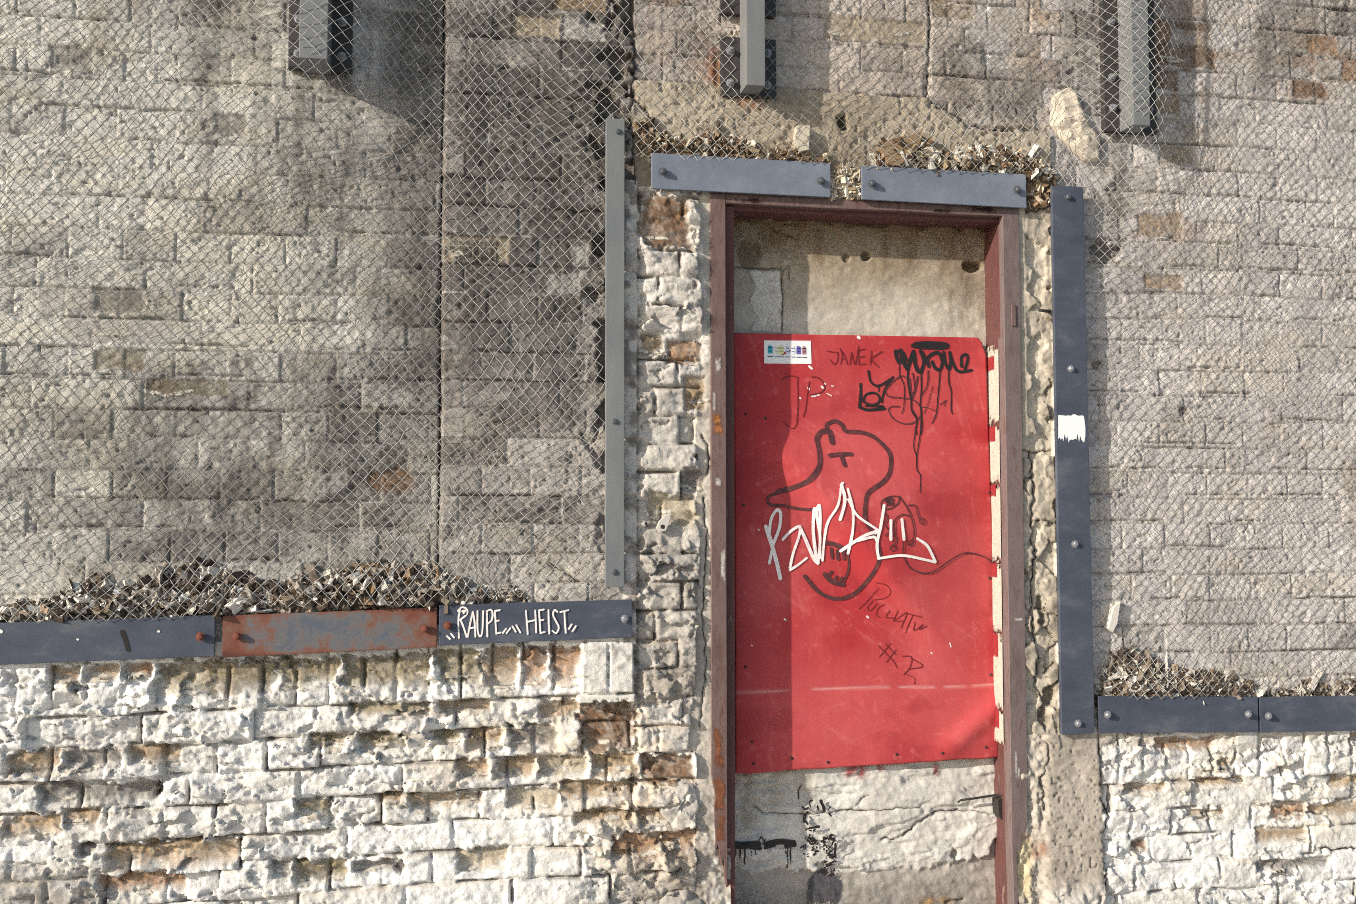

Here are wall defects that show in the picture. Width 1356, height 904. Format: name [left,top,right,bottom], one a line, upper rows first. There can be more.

spalling [625,195,721,410]
crack [1025,450,1052,696]
spalling [9,742,180,840]
spalling [101,837,240,895]
spalling [275,857,395,887]
spalling [53,643,695,863]
spalling [454,848,507,871]
crack [758,795,984,840]
spalling [1129,839,1145,856]
spalling [1155,737,1210,756]
spalling [1195,759,1251,790]
spalling [1255,775,1356,874]